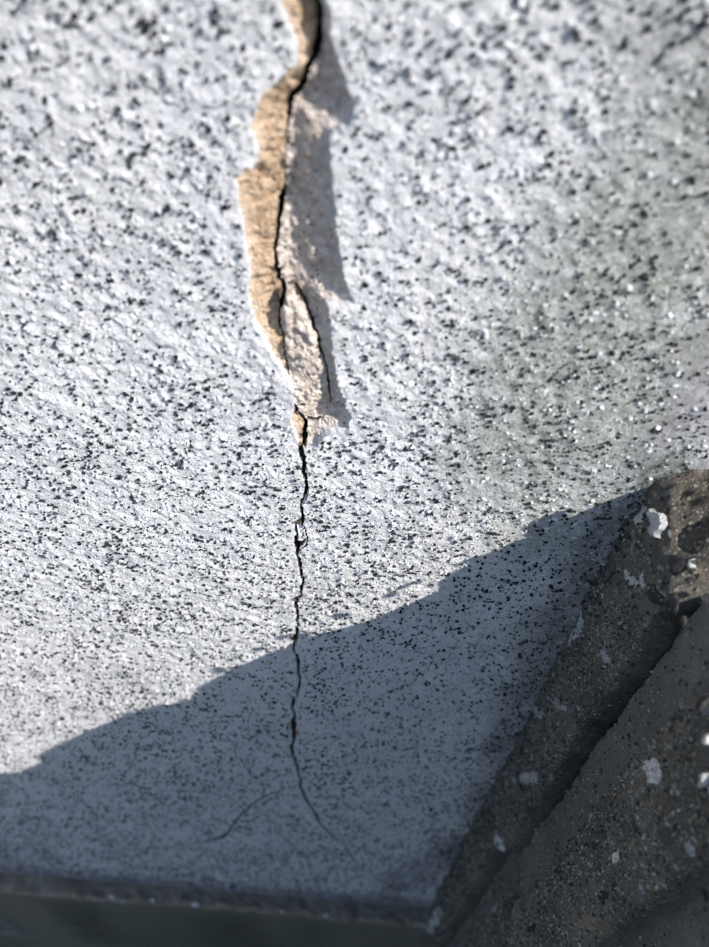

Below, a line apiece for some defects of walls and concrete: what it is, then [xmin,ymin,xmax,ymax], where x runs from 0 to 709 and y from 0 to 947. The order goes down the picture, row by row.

flaking render [236,0,352,460]
crack [153,425,347,849]